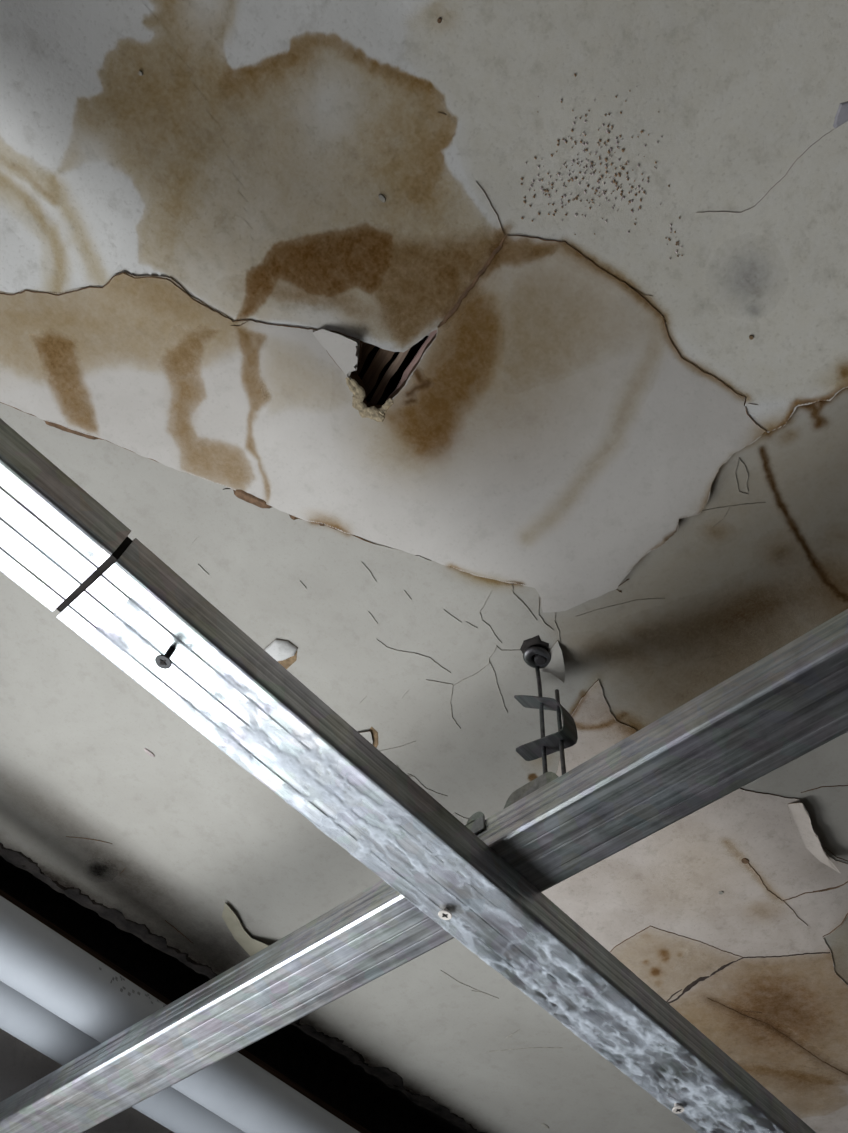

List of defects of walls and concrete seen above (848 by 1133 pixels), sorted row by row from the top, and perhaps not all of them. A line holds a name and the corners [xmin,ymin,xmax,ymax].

water stain [520,86,662,234]
crack [698,131,831,213]
crack [0,272,359,380]
spalling [312,329,437,422]
crack [438,182,766,431]
crack [368,579,665,729]
crack [380,741,469,819]
peeling [556,680,637,777]
peeling [542,788,848,1133]